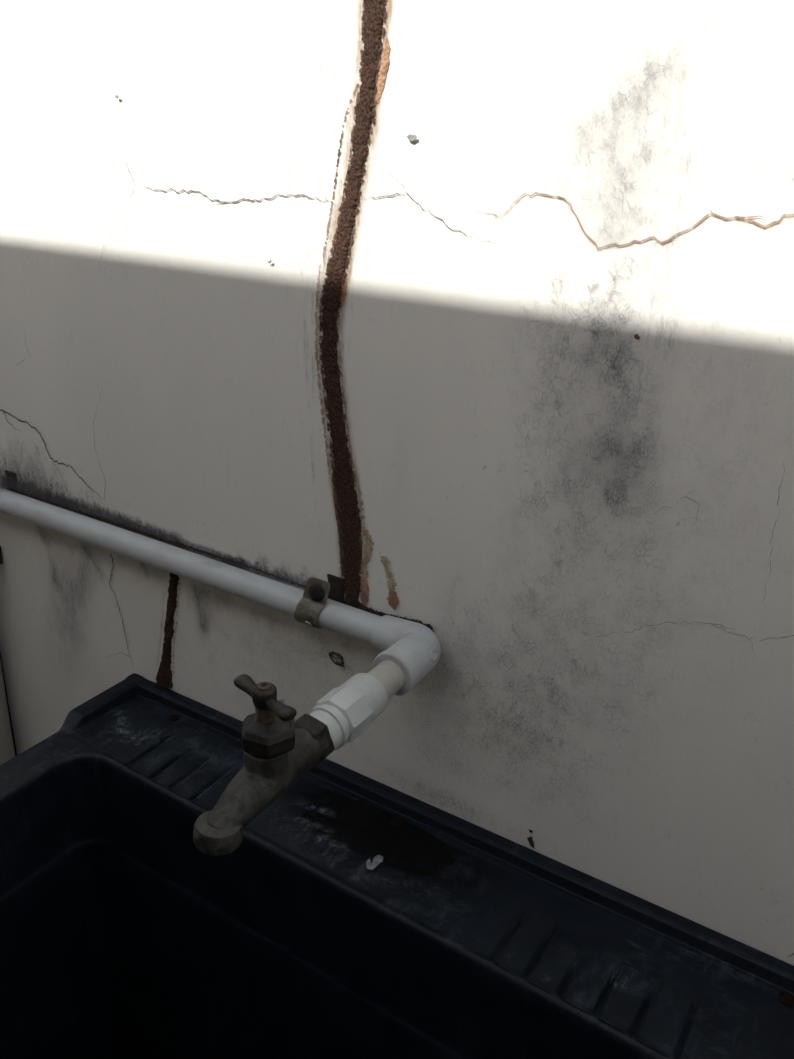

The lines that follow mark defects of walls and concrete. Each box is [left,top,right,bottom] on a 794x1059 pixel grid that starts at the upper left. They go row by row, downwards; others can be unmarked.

damp [380,0,391,66]
crack [93,101,328,261]
crack [369,174,794,249]
crack [0,398,106,498]
damp [0,470,307,588]
rust [380,556,399,610]